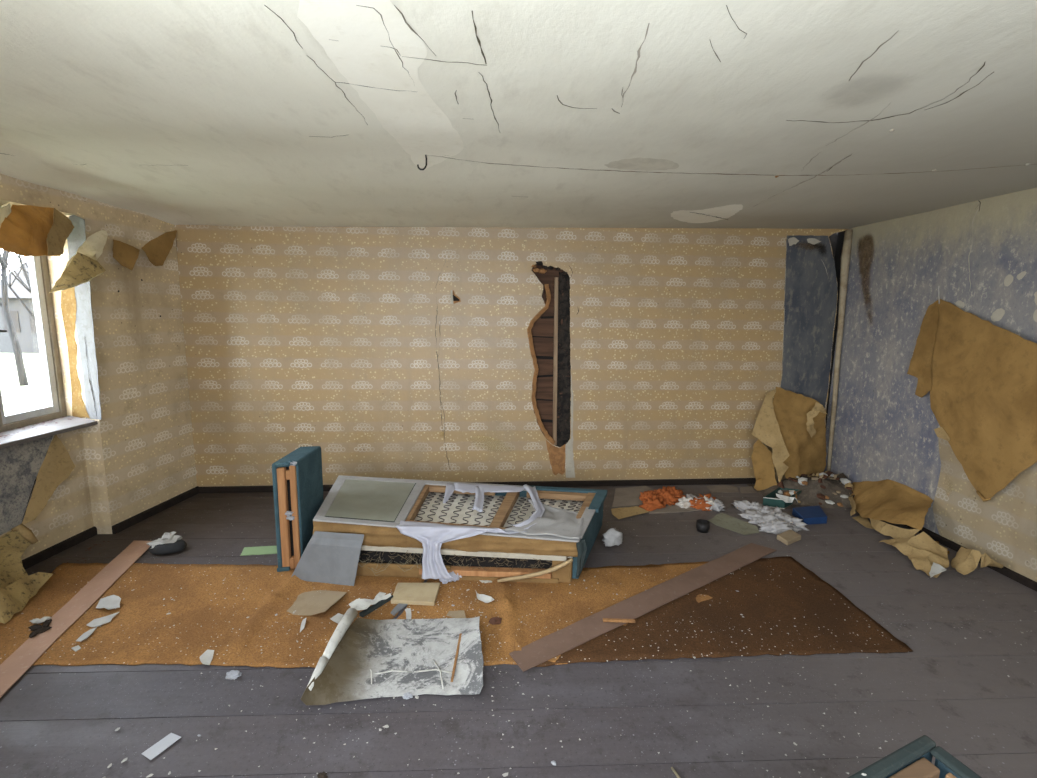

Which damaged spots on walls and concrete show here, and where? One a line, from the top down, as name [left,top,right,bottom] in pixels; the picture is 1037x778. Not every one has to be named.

crack [266,5,500,137]
crack [557,88,623,114]
crack [849,30,899,81]
crack [787,62,994,123]
flaking render [671,204,743,223]
spalling [991,308,1005,322]
spalling [527,261,575,478]
peeling [0,435,75,535]